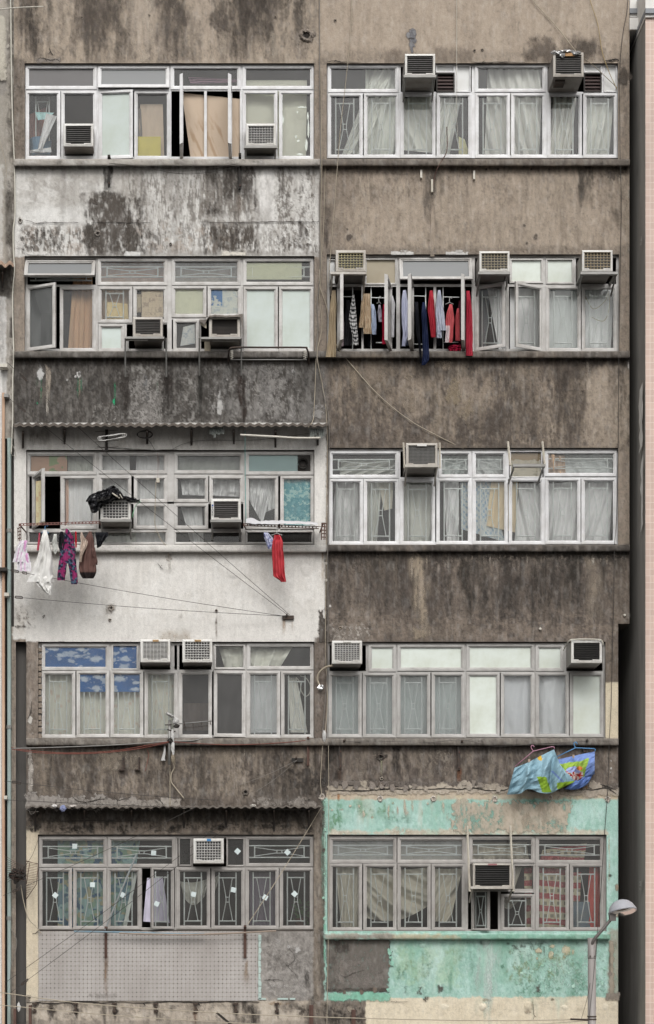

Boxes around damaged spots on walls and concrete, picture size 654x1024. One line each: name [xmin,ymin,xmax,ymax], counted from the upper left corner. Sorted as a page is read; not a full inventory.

water stain [82,167,156,256]
water stain [207,167,256,207]
water stain [18,229,60,256]
water stain [204,224,258,256]
water stain [37,366,51,412]
water stain [93,374,172,423]
water stain [198,375,223,415]
water stain [226,370,247,419]
water stain [410,555,430,639]
spalling [24,749,181,832]
peeling [242,777,619,875]
peeling [515,941,620,1001]